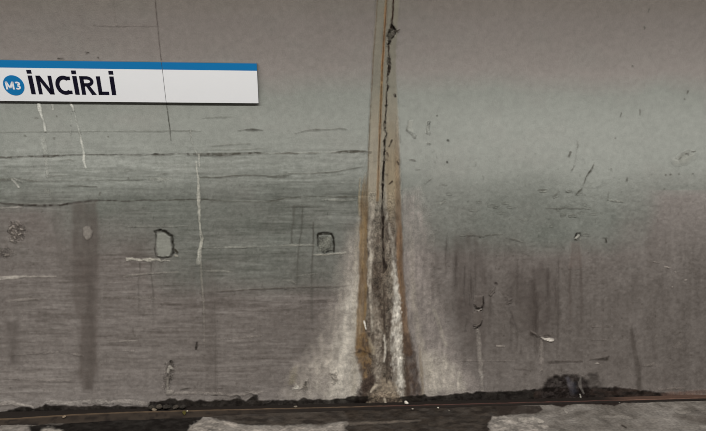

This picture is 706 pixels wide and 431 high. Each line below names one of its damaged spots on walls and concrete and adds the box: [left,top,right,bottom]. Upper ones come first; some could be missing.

spalling [125,229,179,263]
crack [0,0,395,384]
spalling [312,232,347,257]
water stain [0,129,706,431]
corrosion [353,0,388,380]
spalling [529,330,607,399]